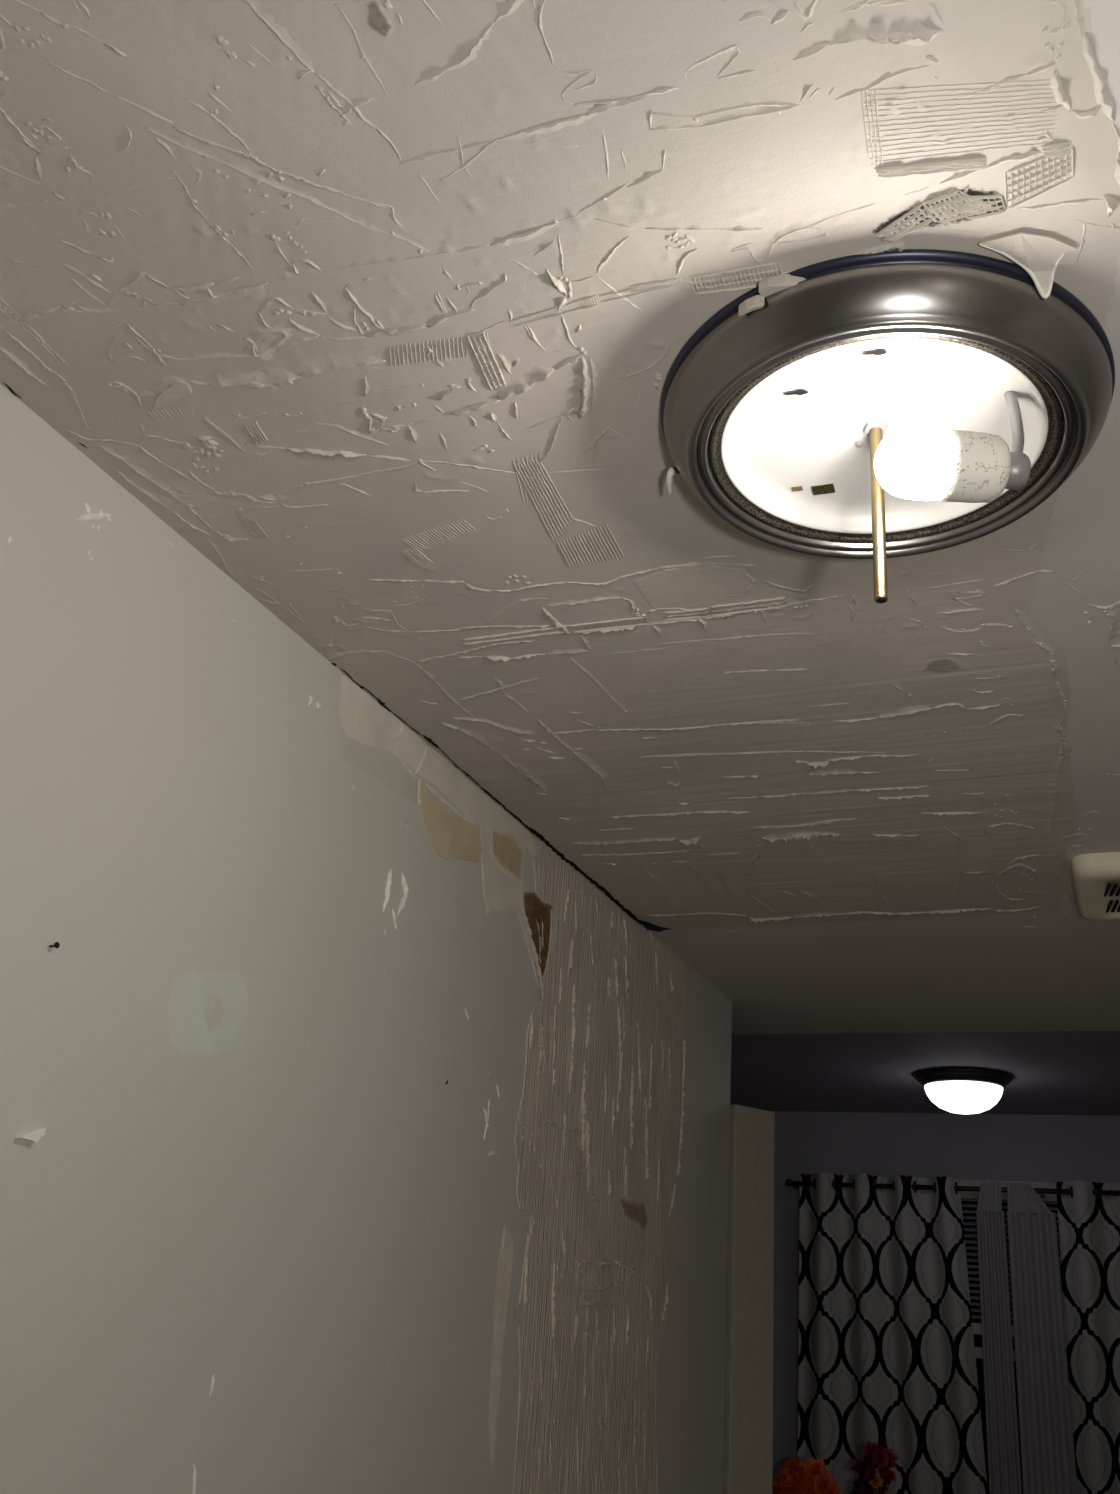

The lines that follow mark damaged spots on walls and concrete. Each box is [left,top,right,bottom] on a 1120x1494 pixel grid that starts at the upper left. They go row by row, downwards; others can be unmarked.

spalling [360,0,403,43]
flaking render [25,117,142,239]
peeling [979,232,1077,299]
flaking render [498,353,520,374]
flaking render [469,402,518,453]
flaking render [666,466,681,496]
crack [332,663,647,927]
spalling [521,892,553,1001]
peeling [15,1127,46,1143]